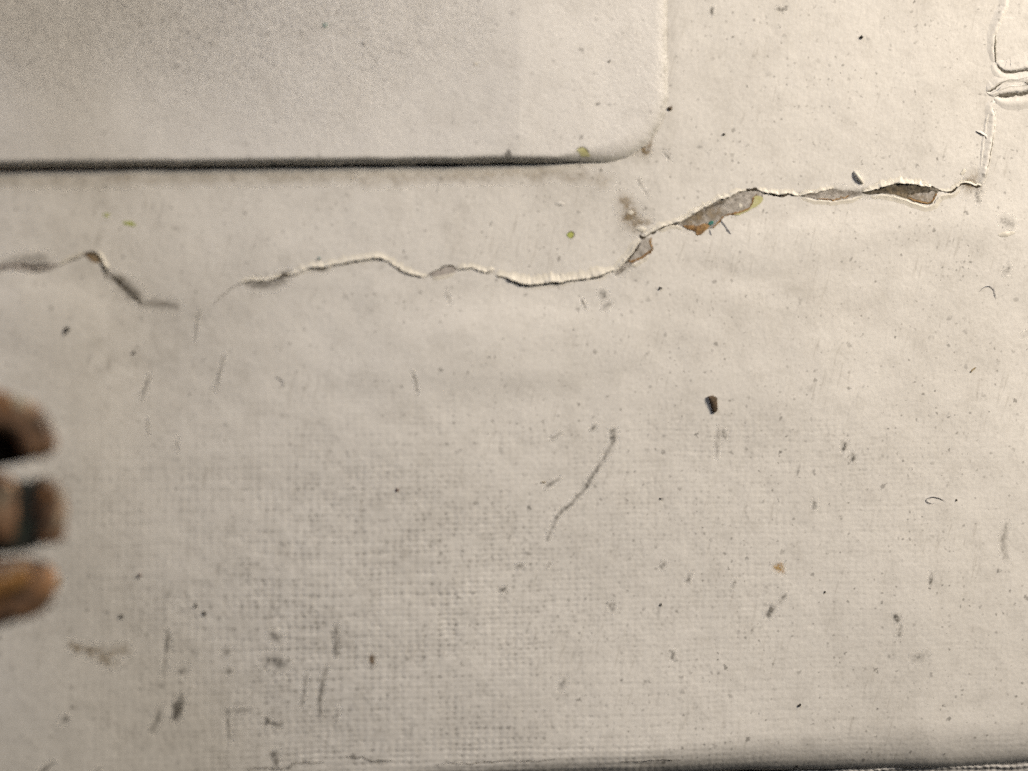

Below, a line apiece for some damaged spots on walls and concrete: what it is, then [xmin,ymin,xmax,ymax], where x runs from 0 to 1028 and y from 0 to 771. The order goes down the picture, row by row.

peeling [612,191,763,275]
crack [639,186,834,239]
peeling [801,171,960,212]
crack [862,175,982,198]
crack [59,251,165,306]
crack [214,252,428,304]
crack [457,262,615,286]